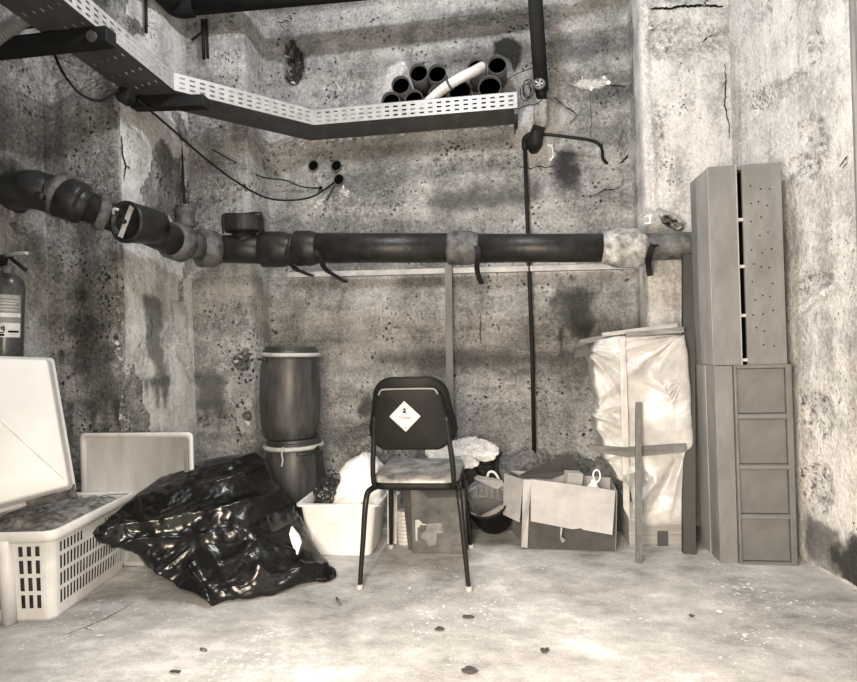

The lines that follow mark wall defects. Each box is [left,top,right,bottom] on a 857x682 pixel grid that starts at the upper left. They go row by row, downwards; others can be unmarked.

crack [649,0,723,10]
peeling [573,76,611,91]
crack [721,64,730,138]
water stain [830,535,857,586]